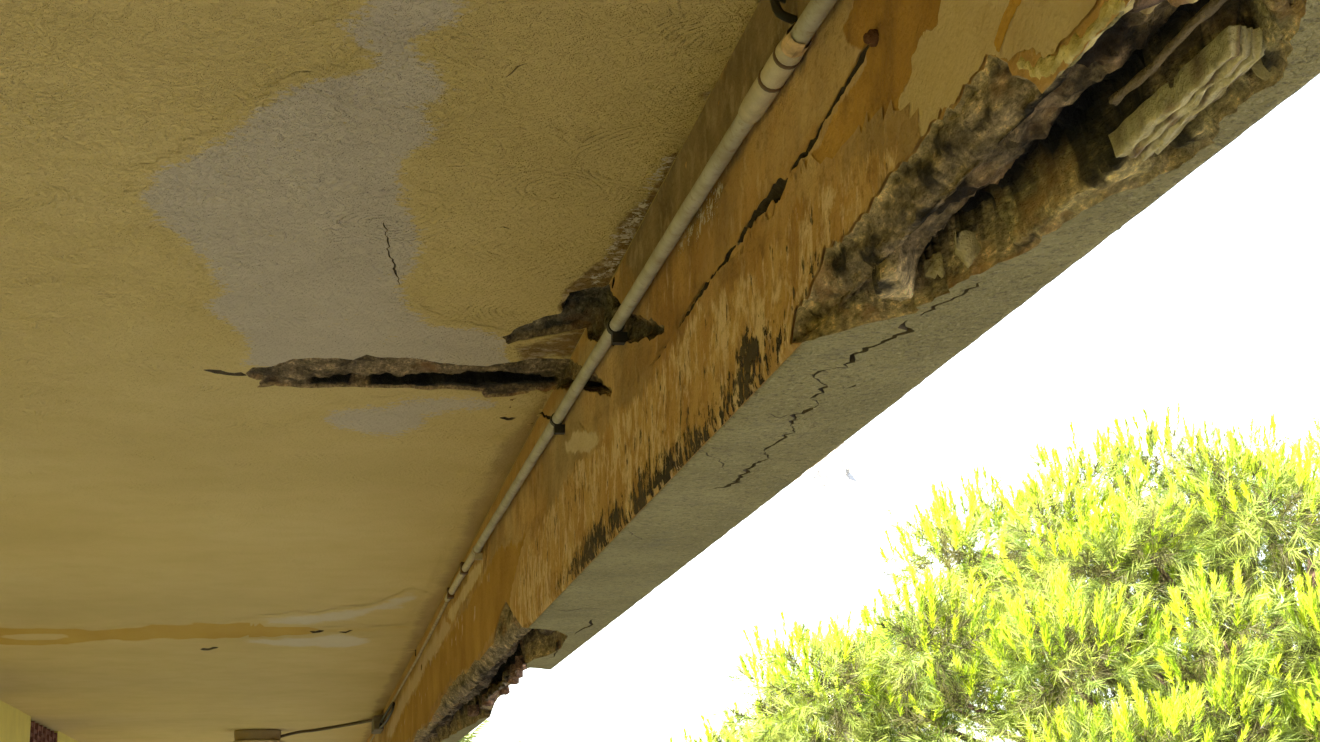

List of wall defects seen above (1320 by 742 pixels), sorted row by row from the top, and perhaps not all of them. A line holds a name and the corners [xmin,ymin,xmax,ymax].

water stain [0,390,552,742]
peeling [122,0,621,444]
crack [383,222,400,285]
water stain [505,329,585,363]
rust [370,0,941,742]
water stain [555,315,785,594]
water stain [552,0,850,314]
crack [659,45,870,357]
crack [705,281,982,490]
spalling [385,0,1307,742]